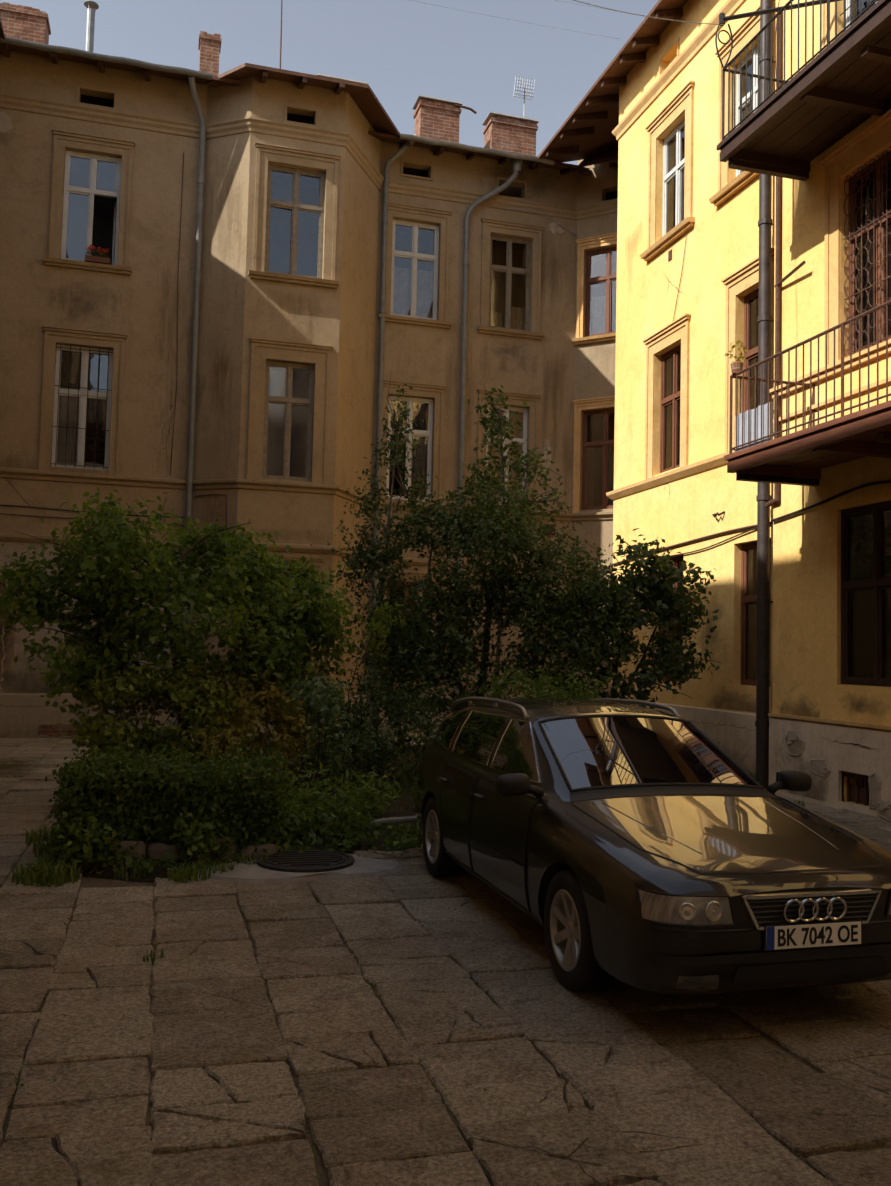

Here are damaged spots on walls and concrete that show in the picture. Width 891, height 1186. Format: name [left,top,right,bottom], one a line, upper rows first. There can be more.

flaking render [868,772,891,822]